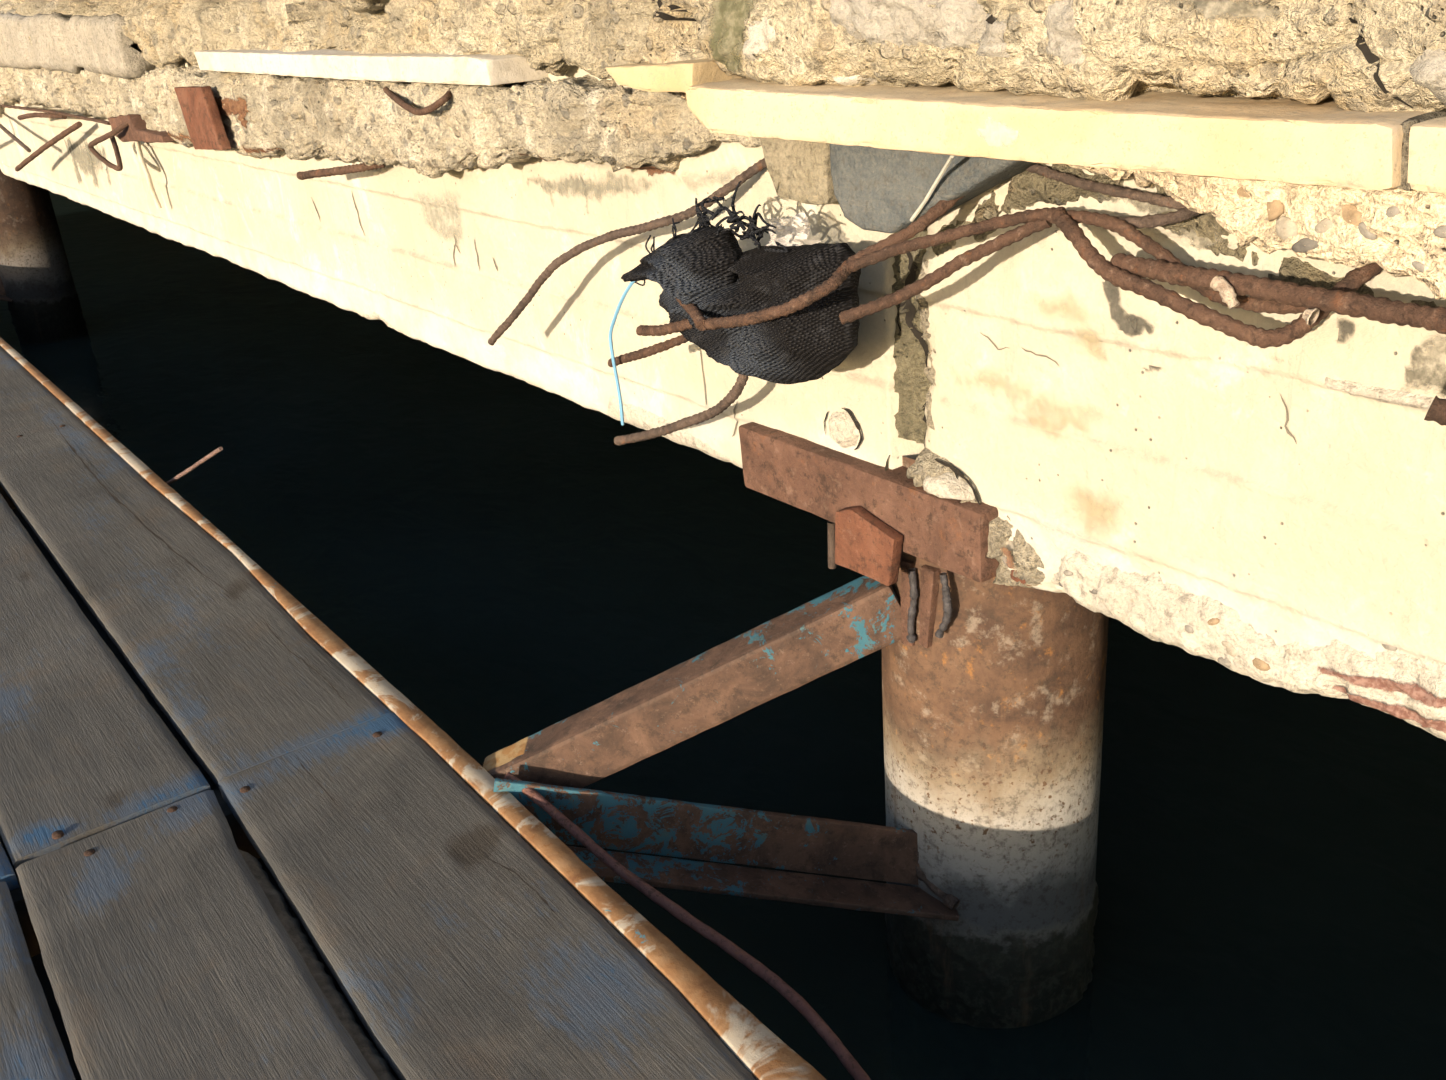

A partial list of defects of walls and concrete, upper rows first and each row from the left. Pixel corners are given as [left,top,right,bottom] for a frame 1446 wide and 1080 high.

peeling [742,16,776,61]
crack [1349,17,1413,108]
rust [215,96,251,128]
rust [243,146,285,154]
spalling [0,64,762,179]
rust [625,166,675,176]
crack [897,252,929,367]
spalling [915,163,1446,430]
damp [1406,336,1446,395]
crack [922,403,981,505]
spalling [986,515,1446,741]
rust [1318,667,1446,733]